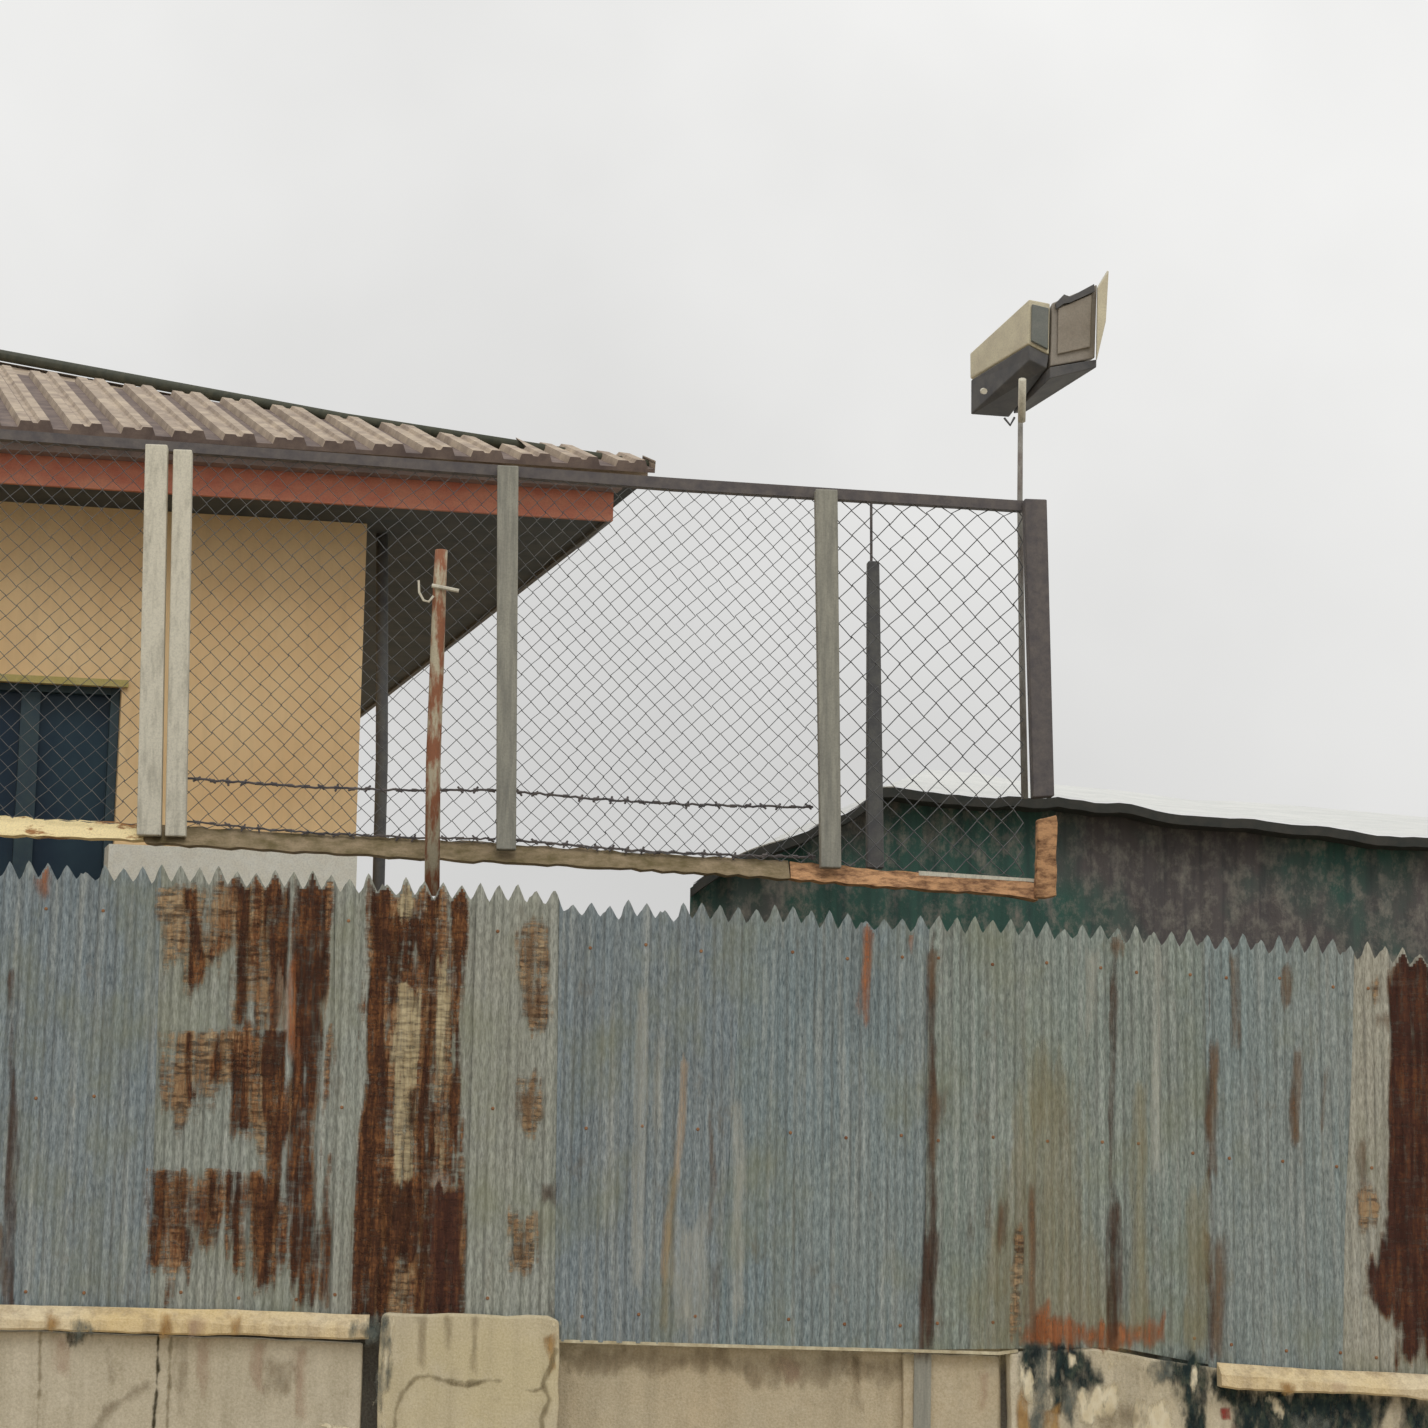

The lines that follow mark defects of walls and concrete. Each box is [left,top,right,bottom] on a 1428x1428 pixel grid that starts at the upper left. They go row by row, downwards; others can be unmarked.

rust [146,874,334,1336]
rust [351,878,469,1324]
rust [515,918,549,1037]
rust [929,949,940,1158]
rust [1358,954,1428,1371]
rust [919,1179,938,1350]
rust [998,1189,1165,1348]
crack [152,1335,171,1428]
crack [395,1376,484,1427]
crack [534,1350,556,1428]
water stain [1019,1344,1103,1428]
water stain [1156,1351,1428,1428]